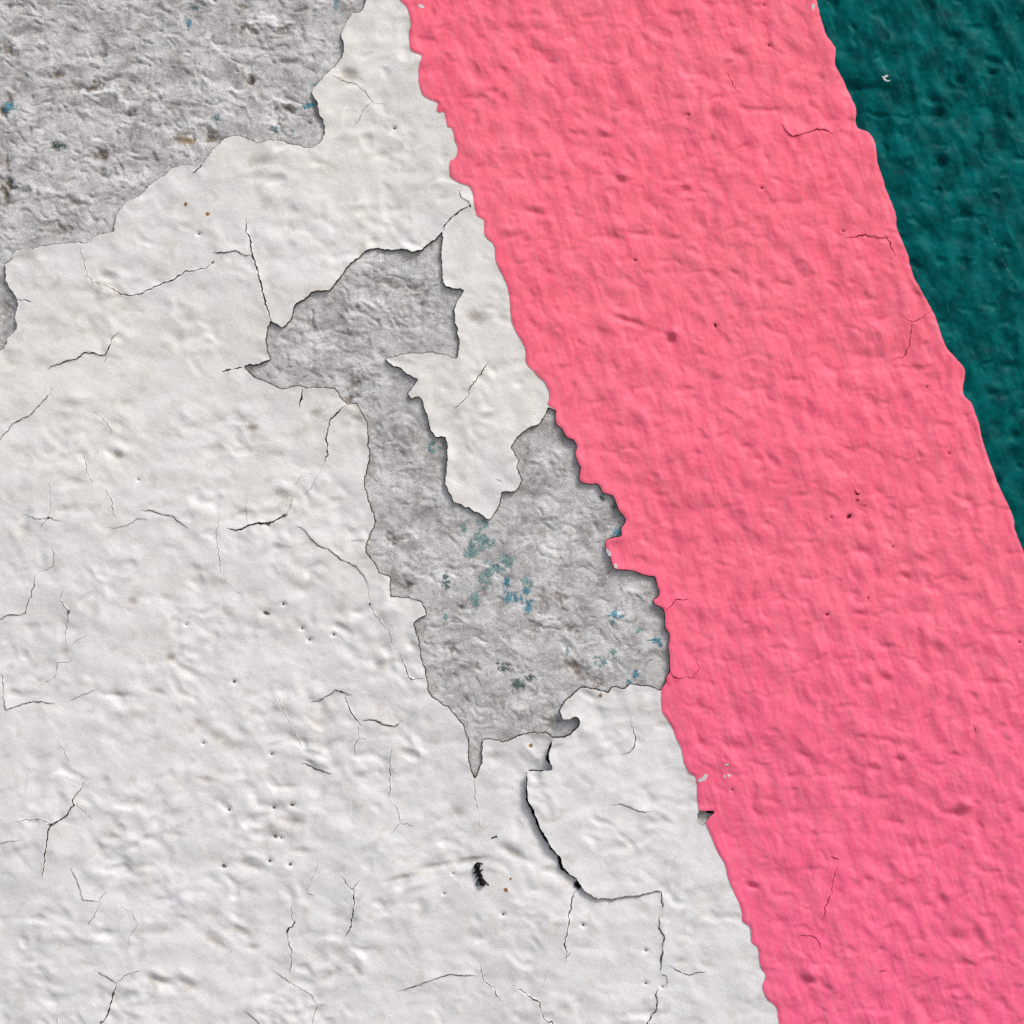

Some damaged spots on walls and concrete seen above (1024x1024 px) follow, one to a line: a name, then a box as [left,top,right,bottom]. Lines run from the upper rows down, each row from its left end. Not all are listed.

peeling [0,0,366,351]
crack [80,222,271,319]
crack [0,333,119,440]
crack [1,548,99,710]
crack [216,389,424,680]
peeling [245,232,730,900]
crack [0,781,91,877]
crack [98,971,138,1024]
crack [270,861,318,1023]
crack [313,689,414,829]
crack [401,741,581,1024]
crack [647,892,704,1024]